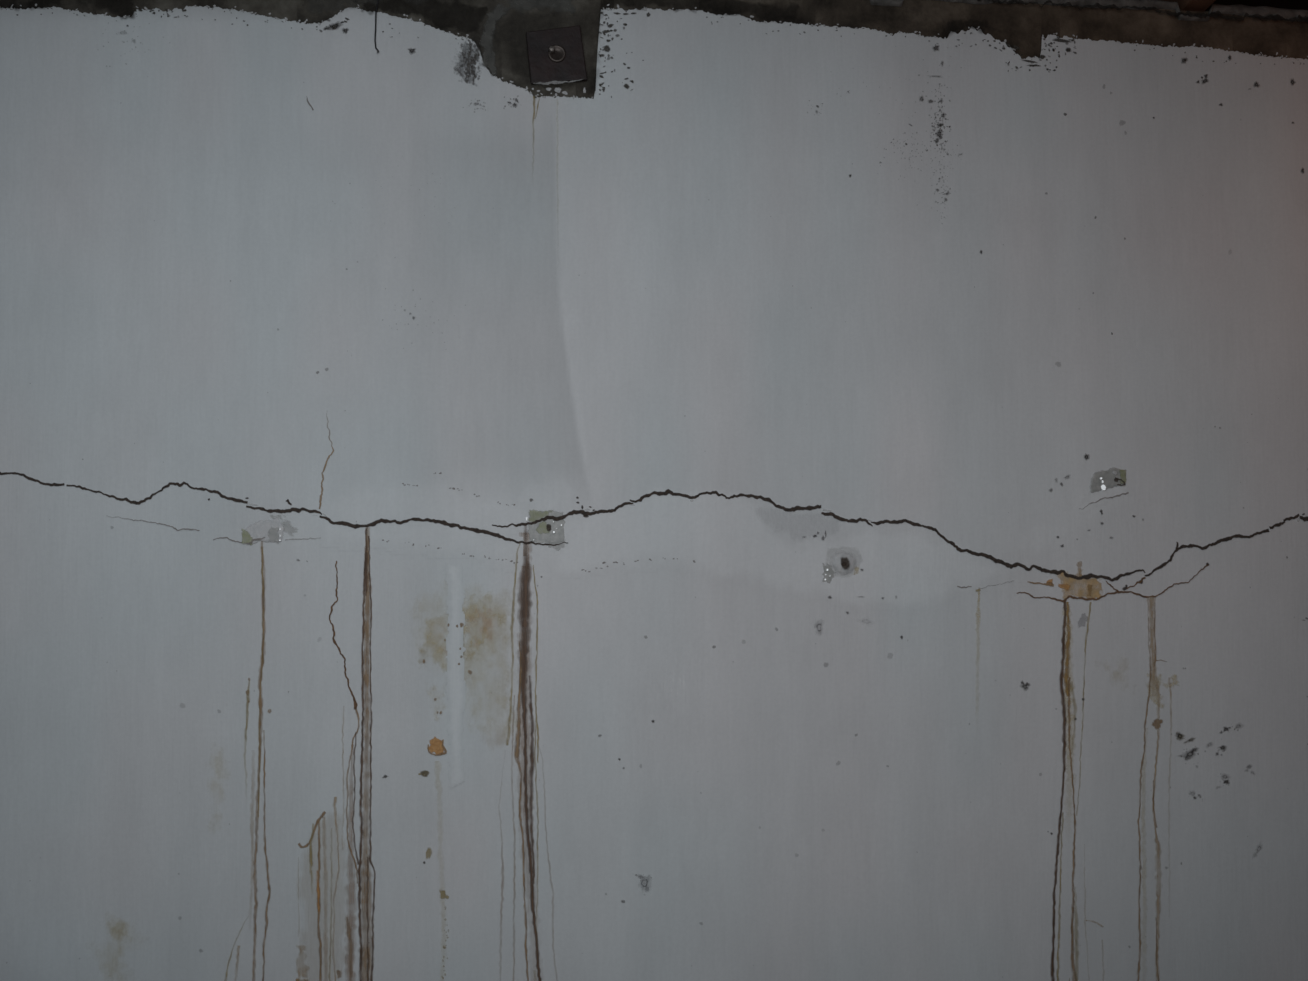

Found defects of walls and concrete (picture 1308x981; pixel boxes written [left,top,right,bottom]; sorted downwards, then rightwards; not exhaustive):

peeling [0,0,1308,99]
corrosion [245,547,270,981]
corrosion [296,528,375,981]
crack [329,561,357,709]
corrosion [427,737,447,756]
corrosion [507,532,541,981]
crack [0,437,1308,602]
corrosion [1028,571,1102,981]
corrosion [1137,597,1163,981]